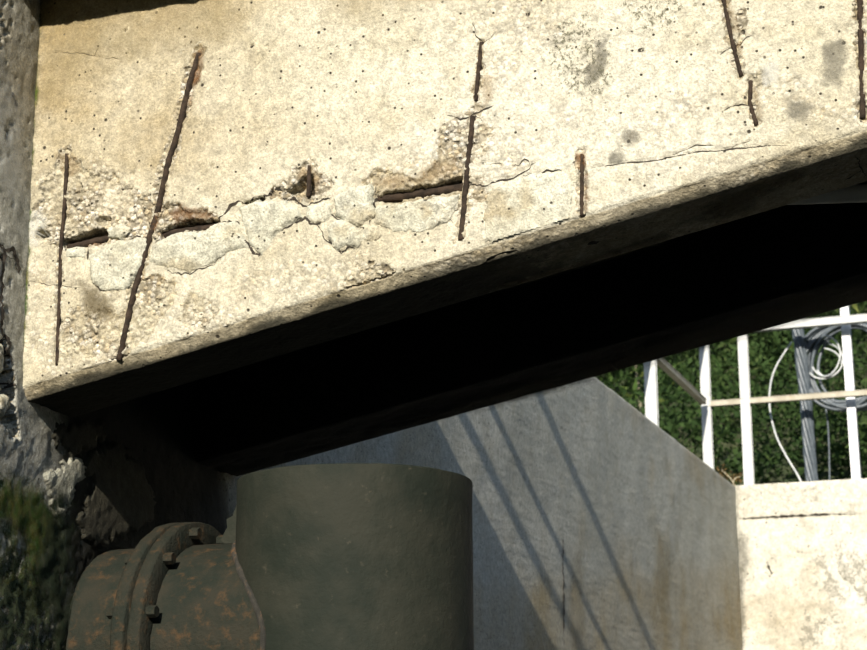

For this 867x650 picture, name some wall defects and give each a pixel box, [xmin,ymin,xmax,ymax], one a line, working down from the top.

crack [0,243,119,360]
crack [167,258,219,275]
crack [189,187,378,257]
spalling [30,39,590,368]
crack [0,382,16,390]
spalling [0,334,19,440]